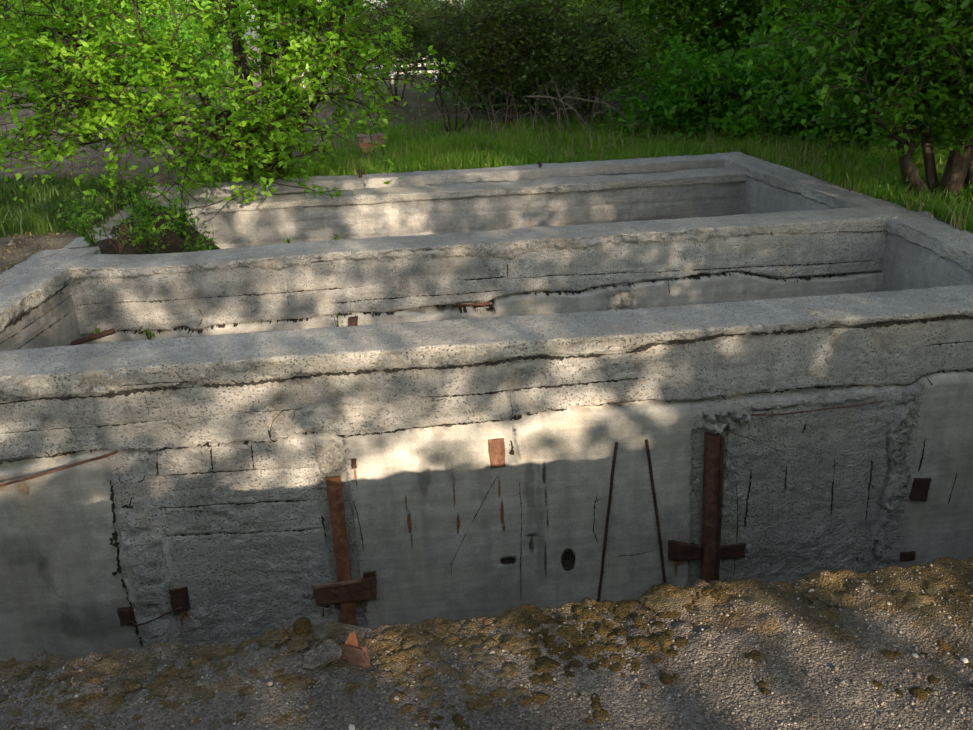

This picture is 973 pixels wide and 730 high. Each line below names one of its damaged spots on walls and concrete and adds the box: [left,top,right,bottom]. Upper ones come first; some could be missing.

crack [0,261,868,350]
crack [0,315,973,646]